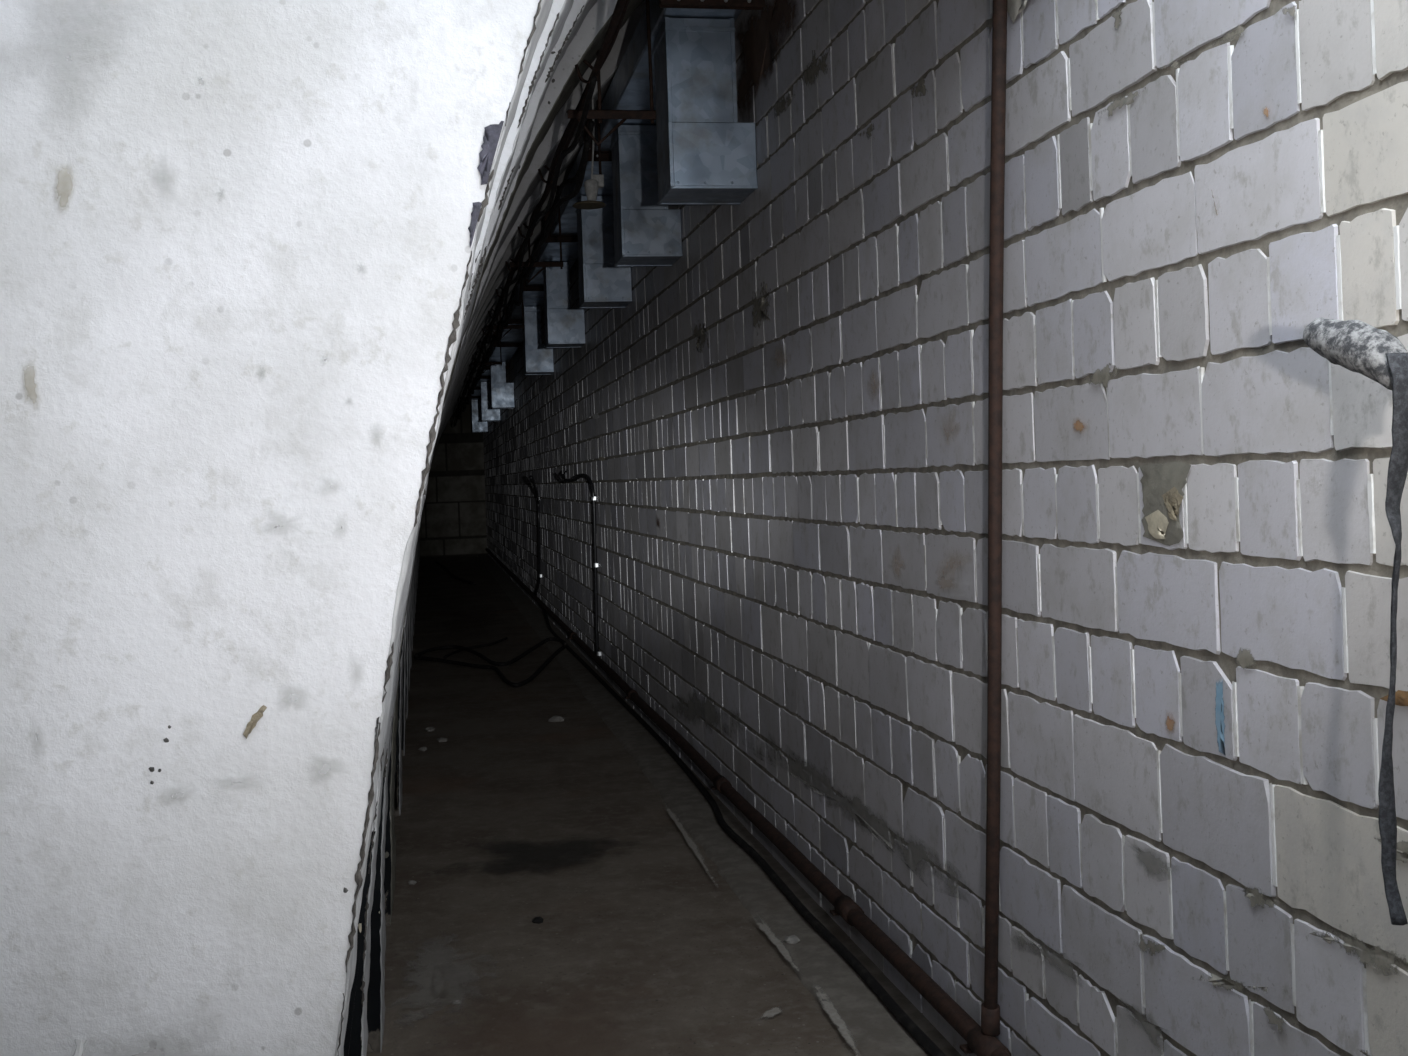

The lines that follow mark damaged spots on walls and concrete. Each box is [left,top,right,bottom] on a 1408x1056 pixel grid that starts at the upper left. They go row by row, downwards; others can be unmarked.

peeling [477,121,504,185]
peeling [468,202,482,247]
spalling [1140,462,1191,546]
peeling [1380,690,1408,706]
leakage [485,840,611,873]